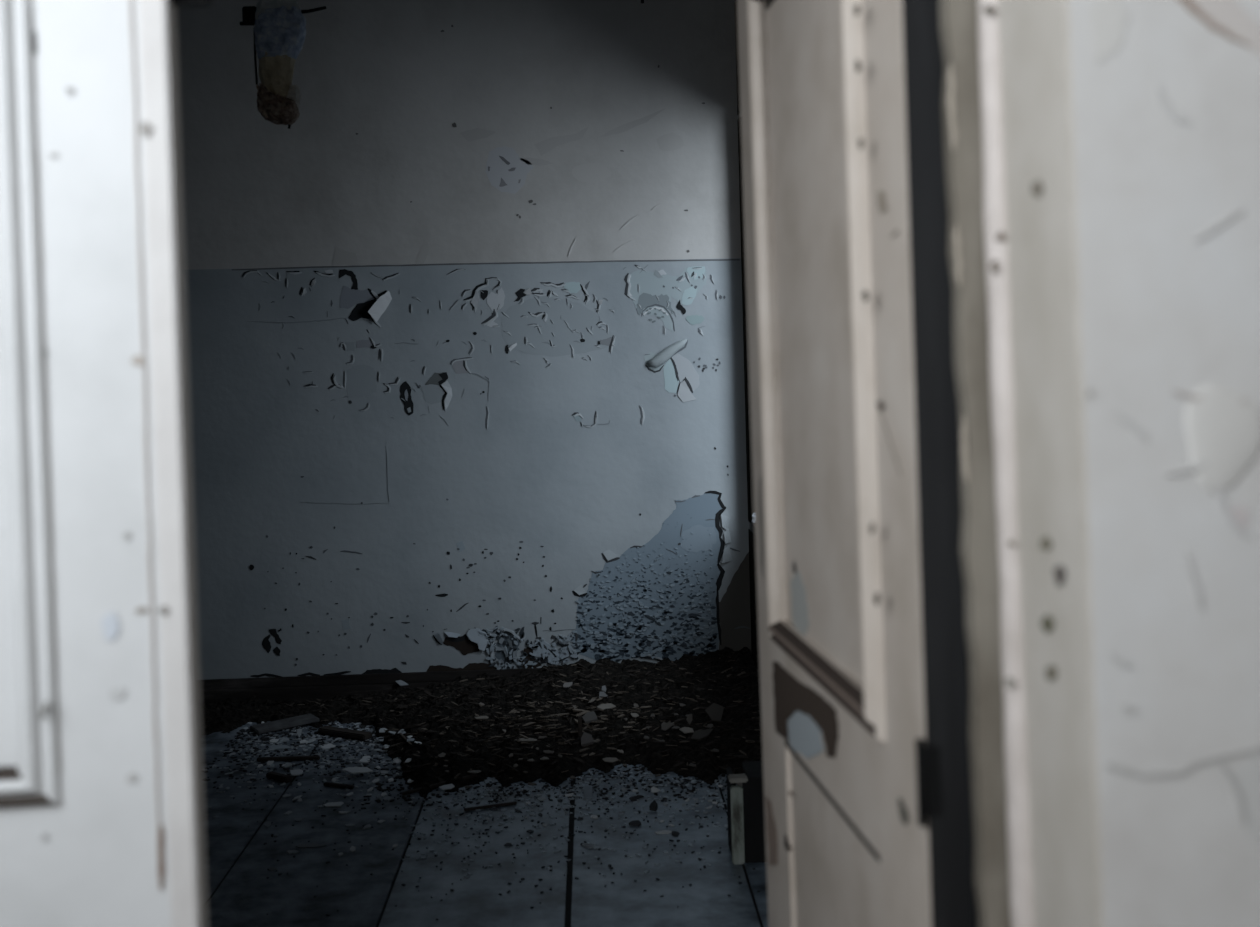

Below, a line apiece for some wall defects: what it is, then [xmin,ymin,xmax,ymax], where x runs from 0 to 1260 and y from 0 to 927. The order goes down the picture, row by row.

peeling [471,281,613,356]
peeling [628,266,707,402]
peeling [400,372,452,415]
flaking render [426,493,732,672]
peeling [262,628,282,656]